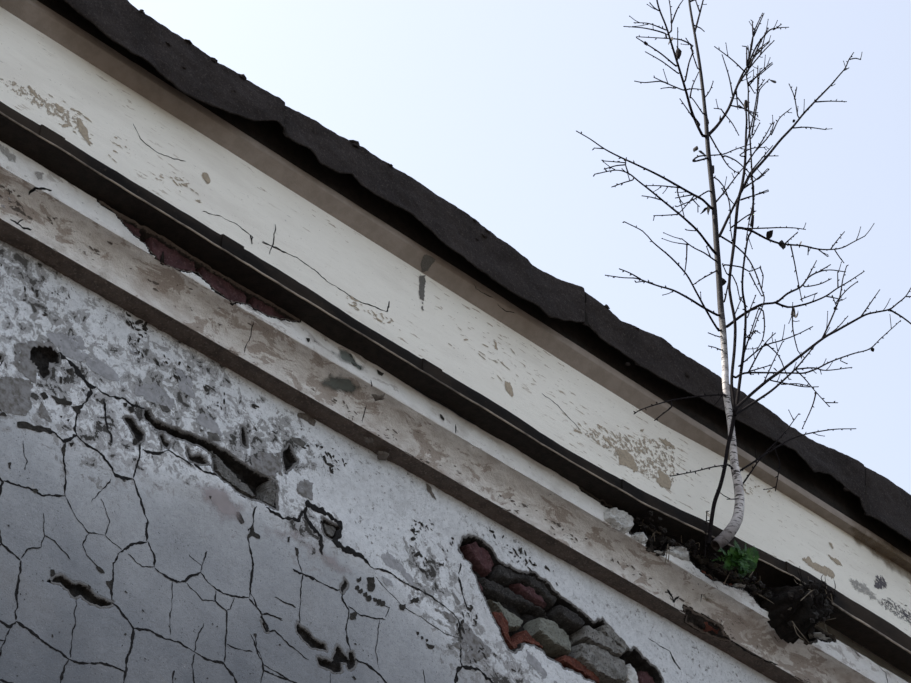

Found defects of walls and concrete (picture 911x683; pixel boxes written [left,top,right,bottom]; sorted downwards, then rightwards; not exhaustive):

peeling [0,78,94,146]
crack [203,211,390,312]
peeling [0,333,120,433]
peeling [126,312,148,359]
peeling [456,324,537,397]
flaking render [122,403,347,511]
peeling [574,422,680,489]
crack [0,352,494,683]
flaking render [236,512,260,539]
flaking render [42,567,114,609]
flaking render [339,576,393,606]
flaking render [381,519,664,683]